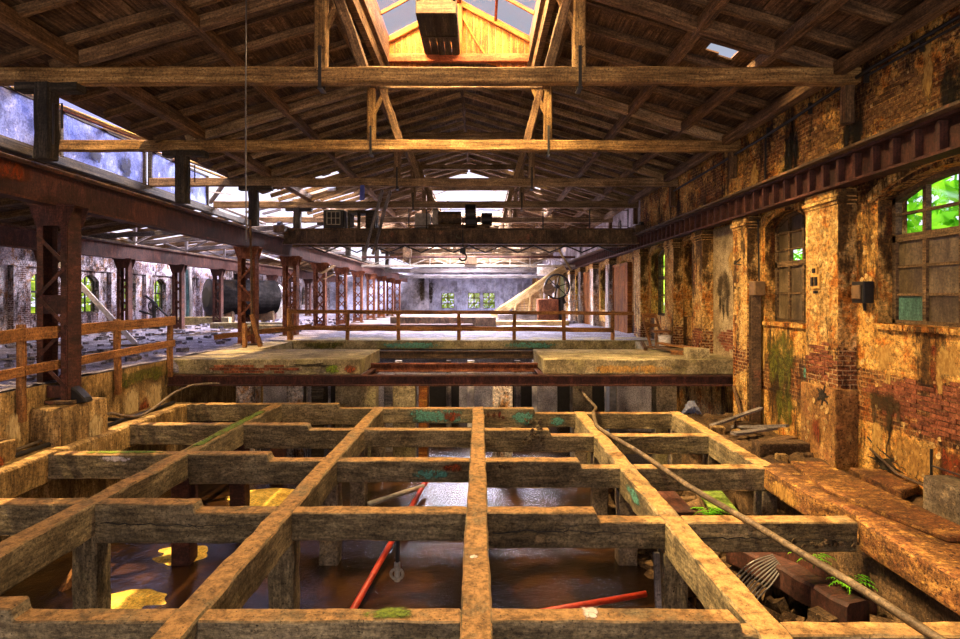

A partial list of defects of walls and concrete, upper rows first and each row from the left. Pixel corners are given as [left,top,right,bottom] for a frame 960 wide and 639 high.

damp [717,249,733,321]
damp [761,321,791,430]
spalling [804,342,837,440]
spalling [863,378,960,476]